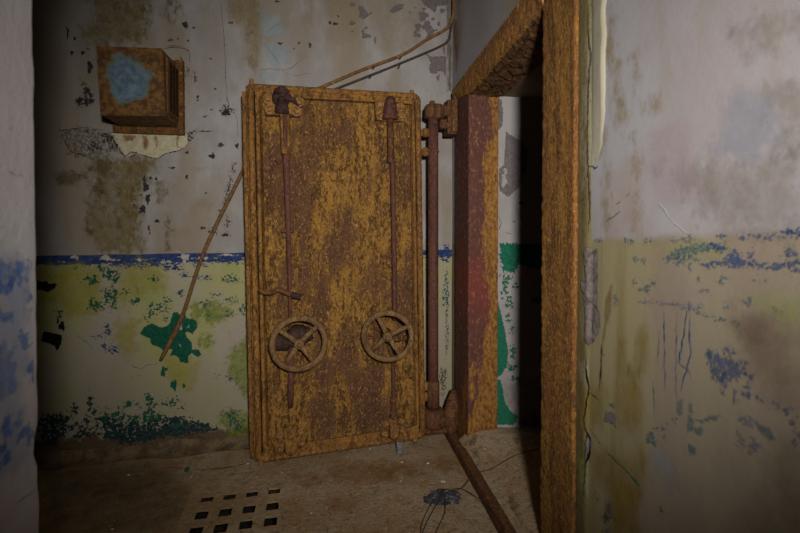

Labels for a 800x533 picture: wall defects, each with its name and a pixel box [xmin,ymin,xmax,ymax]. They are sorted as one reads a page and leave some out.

peeling [390,0,448,38]
peeling [591,0,607,165]
spalling [59,126,210,160]
peeling [498,97,528,196]
water stain [87,158,166,253]
water stain [200,162,237,237]
peeling [36,280,56,292]
peeling [41,307,65,350]
peeling [70,250,247,363]
spalling [580,247,601,345]
peeling [37,366,218,447]
crack [577,347,604,498]